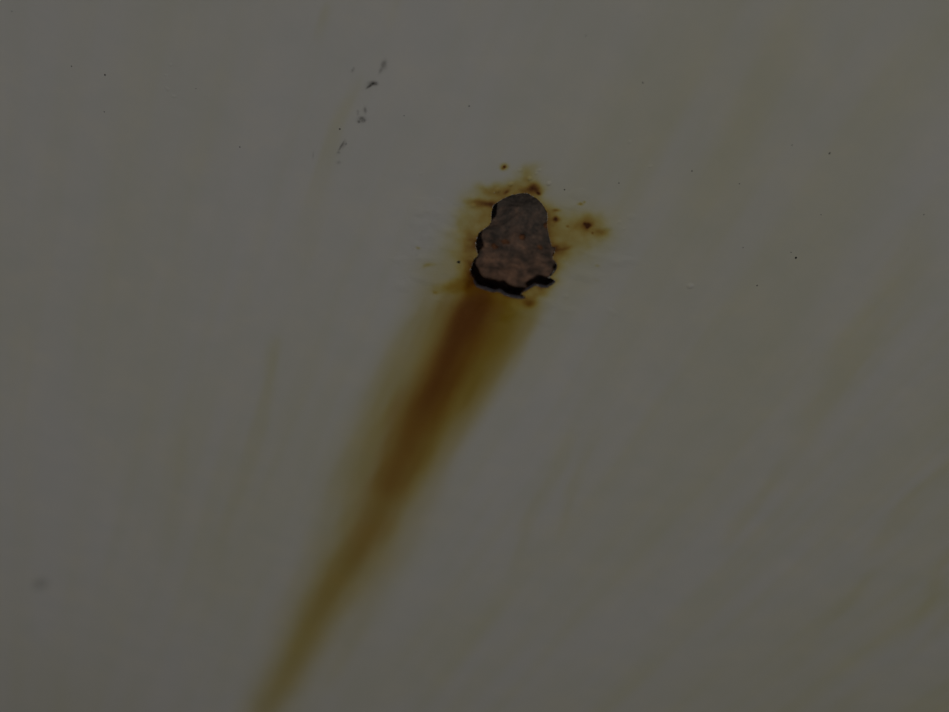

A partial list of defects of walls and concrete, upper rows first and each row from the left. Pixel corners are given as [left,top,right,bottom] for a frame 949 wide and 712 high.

spalling [471,193,556,296]